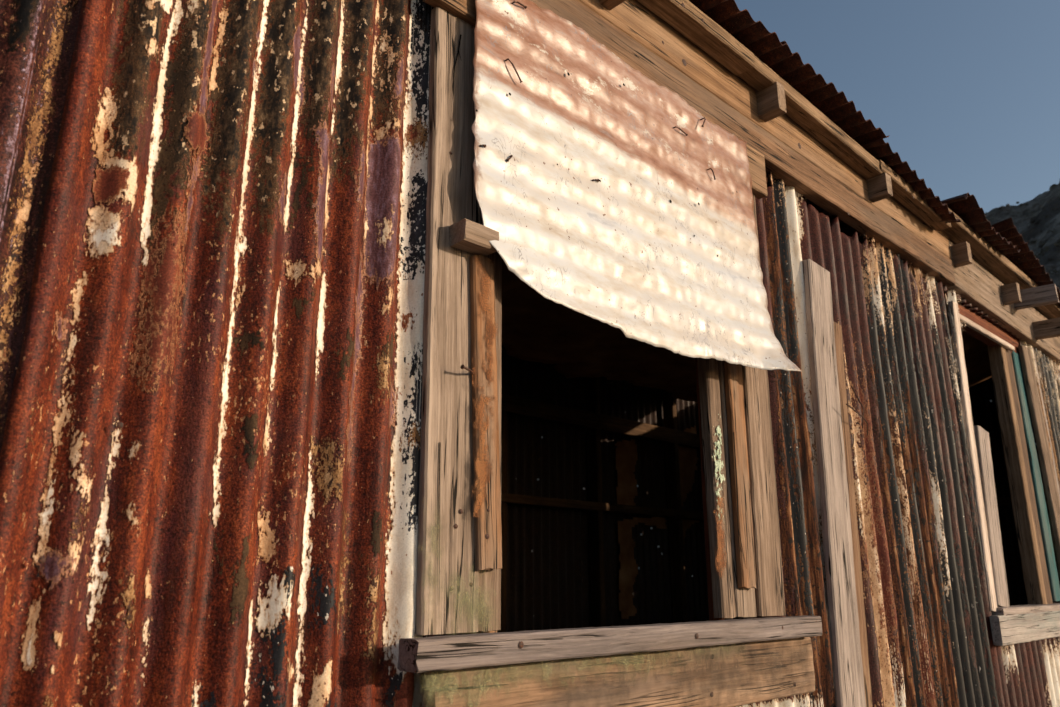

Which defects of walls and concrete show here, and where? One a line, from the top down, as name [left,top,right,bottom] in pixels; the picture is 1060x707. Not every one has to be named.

peeling [0,0,77,435]
rust [25,538,77,590]
rust [53,311,75,346]
peeling [21,271,152,685]
peeling [83,0,229,266]
rust [125,104,211,394]
peeling [209,0,270,528]
peeling [243,0,433,707]
peeling [843,340,906,707]
rust [848,300,960,707]
peeling [1001,644,1020,683]
peeling [1041,638,1060,707]